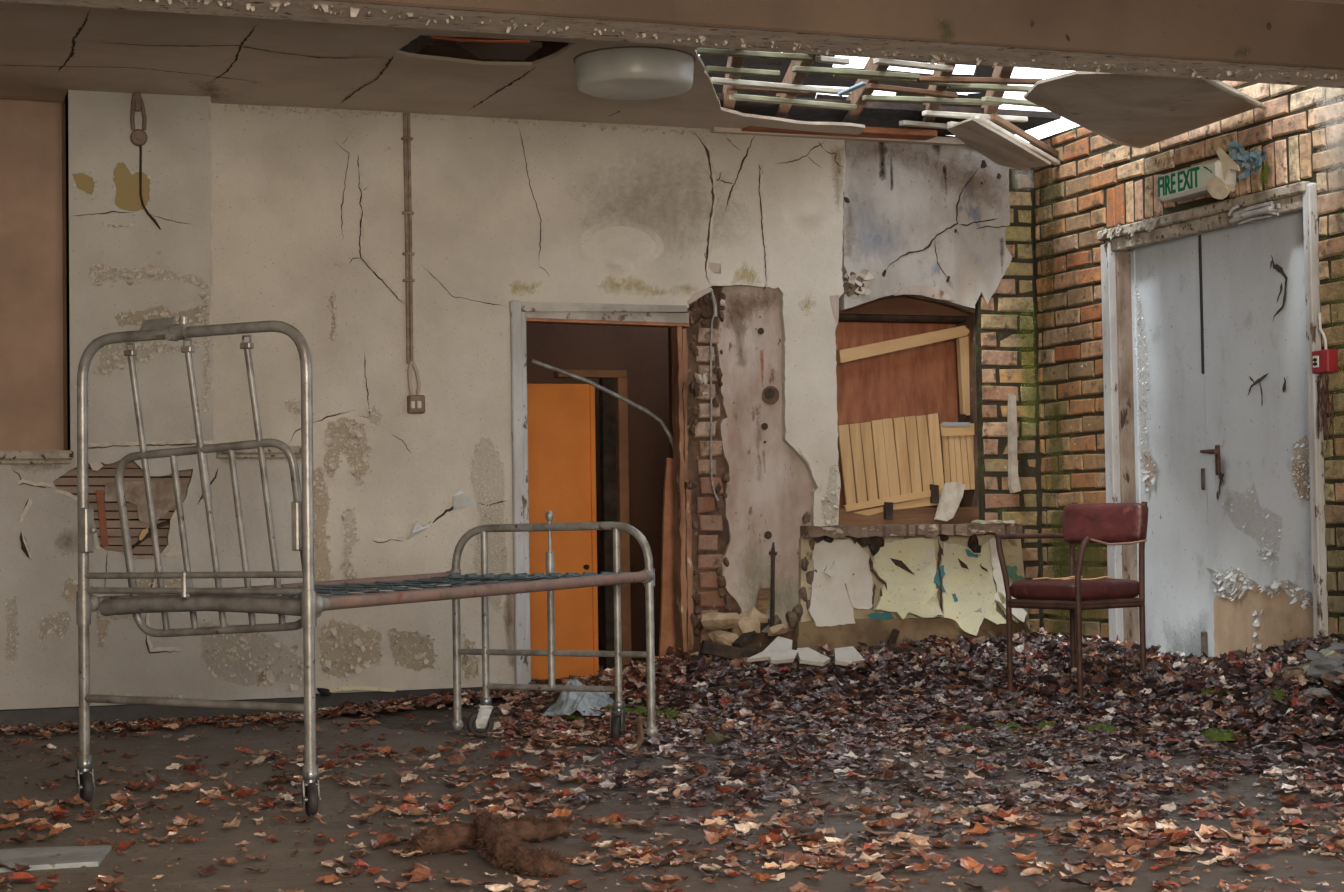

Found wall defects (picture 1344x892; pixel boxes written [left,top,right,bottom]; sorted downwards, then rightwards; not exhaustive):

crack [467,67,535,111]
peeling [72,162,150,216]
crack [9,8,406,305]
crack [520,134,549,275]
crack [694,130,842,290]
crack [888,165,1007,275]
crack [425,269,507,306]
spalling [53,461,192,559]
spalling [684,262,840,652]
peeling [934,565,958,602]
peeling [1206,489,1314,667]
peeling [318,619,439,679]